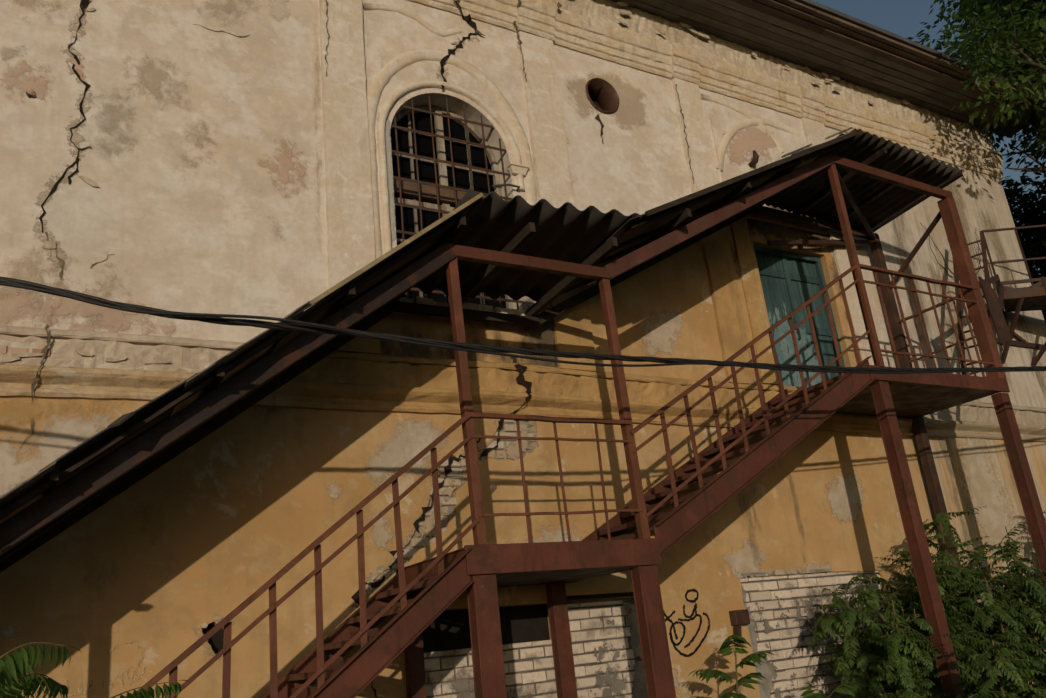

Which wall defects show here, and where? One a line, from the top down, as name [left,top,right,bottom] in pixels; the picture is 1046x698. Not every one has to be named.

crack [437,0,485,88]
crack [34,0,99,280]
peeling [642,310,683,355]
crack [19,314,53,449]
peeling [0,415,110,497]
crack [351,357,532,605]
spalling [367,419,538,586]
peeling [823,471,864,524]
peeling [723,542,832,579]